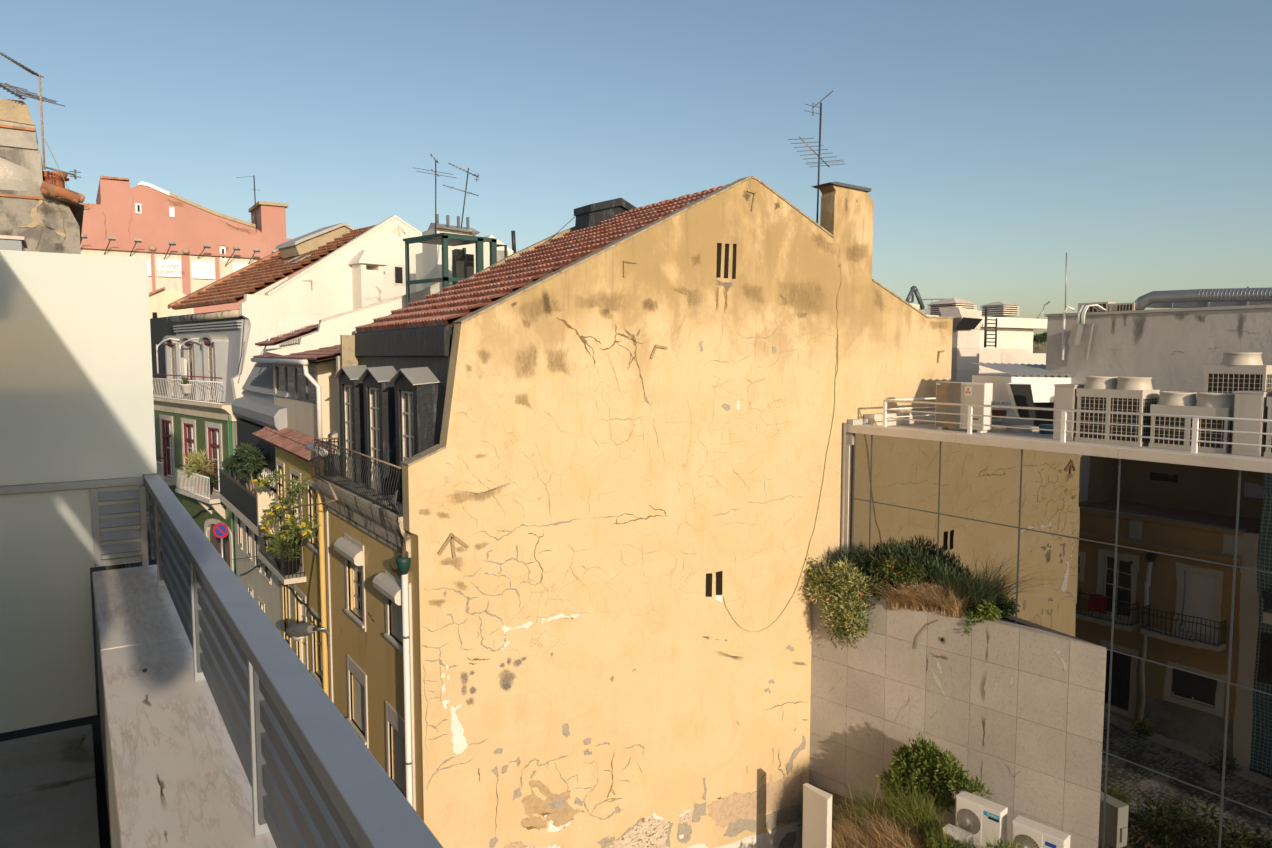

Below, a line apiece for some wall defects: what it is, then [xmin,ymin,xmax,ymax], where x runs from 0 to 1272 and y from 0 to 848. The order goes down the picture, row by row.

crack [421,249,842,834]
peeling [499,614,579,651]
peeling [441,665,468,755]
spalling [489,748,584,848]
spalling [597,736,806,848]